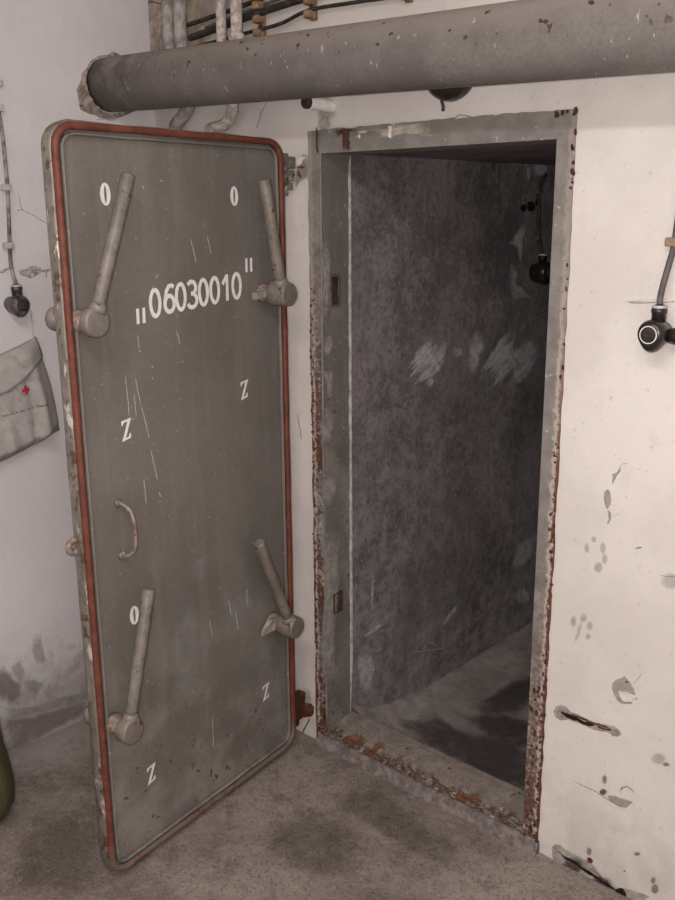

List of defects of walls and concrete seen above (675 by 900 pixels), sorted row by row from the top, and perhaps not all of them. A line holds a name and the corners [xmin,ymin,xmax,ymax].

flaking render [77,52,134,119]
rust [336,129,353,149]
peeling [604,463,626,524]
rust [548,495,556,564]
leakage [0,674,17,700]
leakage [15,707,80,747]
rust [302,659,328,736]
rust [523,652,548,843]
peeling [612,674,641,704]